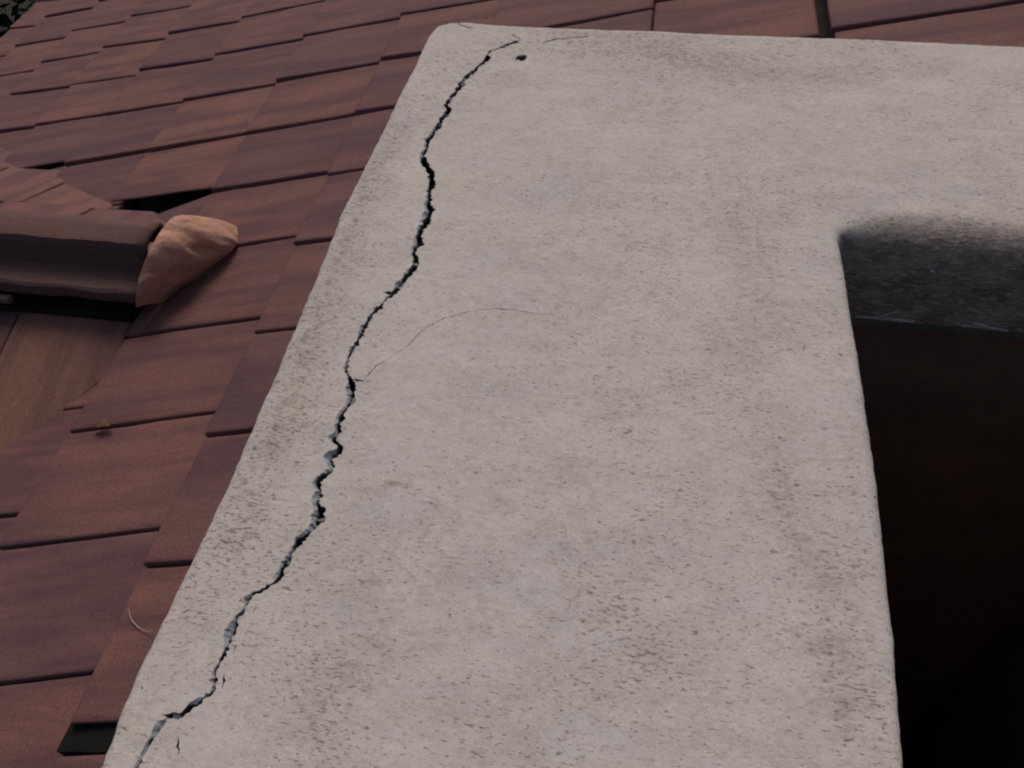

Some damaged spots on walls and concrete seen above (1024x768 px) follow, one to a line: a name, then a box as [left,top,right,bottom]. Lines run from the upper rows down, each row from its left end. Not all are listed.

crack [133,34,589,768]